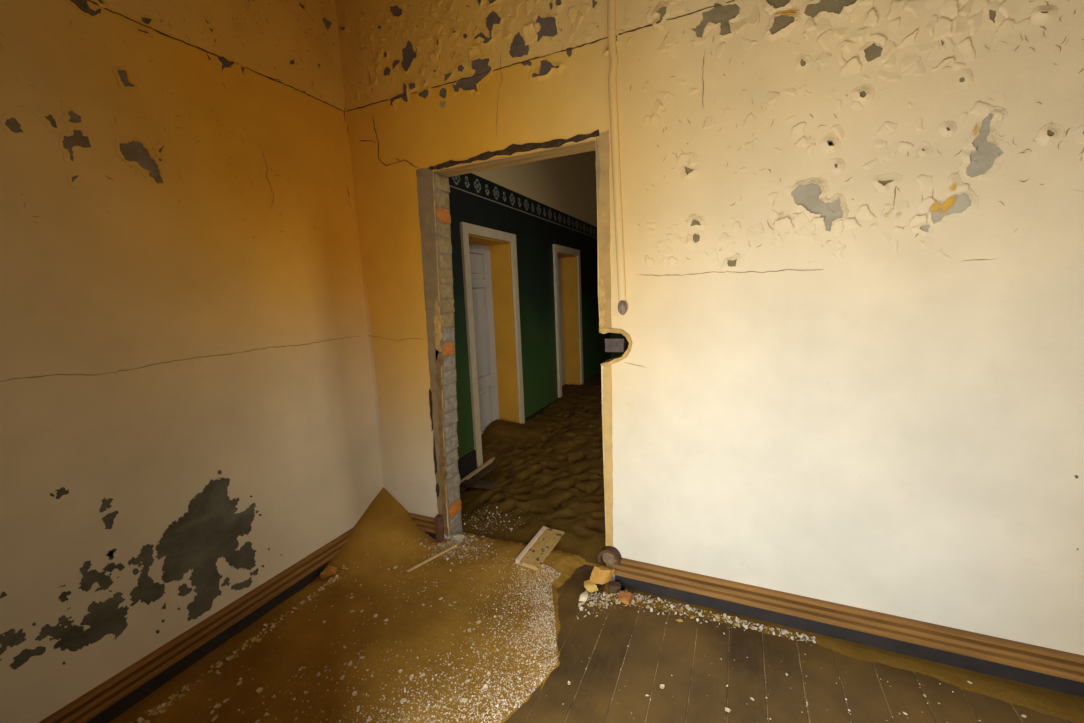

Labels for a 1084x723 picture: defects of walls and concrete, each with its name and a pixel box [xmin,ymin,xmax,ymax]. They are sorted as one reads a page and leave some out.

peeling [381,0,578,112]
peeling [682,0,746,43]
peeling [761,0,860,43]
peeling [858,40,892,71]
crack [985,0,1084,74]
peeling [115,136,168,187]
crack [65,0,735,247]
crack [647,36,774,206]
peeling [773,132,849,236]
peeling [910,105,1011,236]
crack [0,336,424,382]
peeling [0,470,282,670]